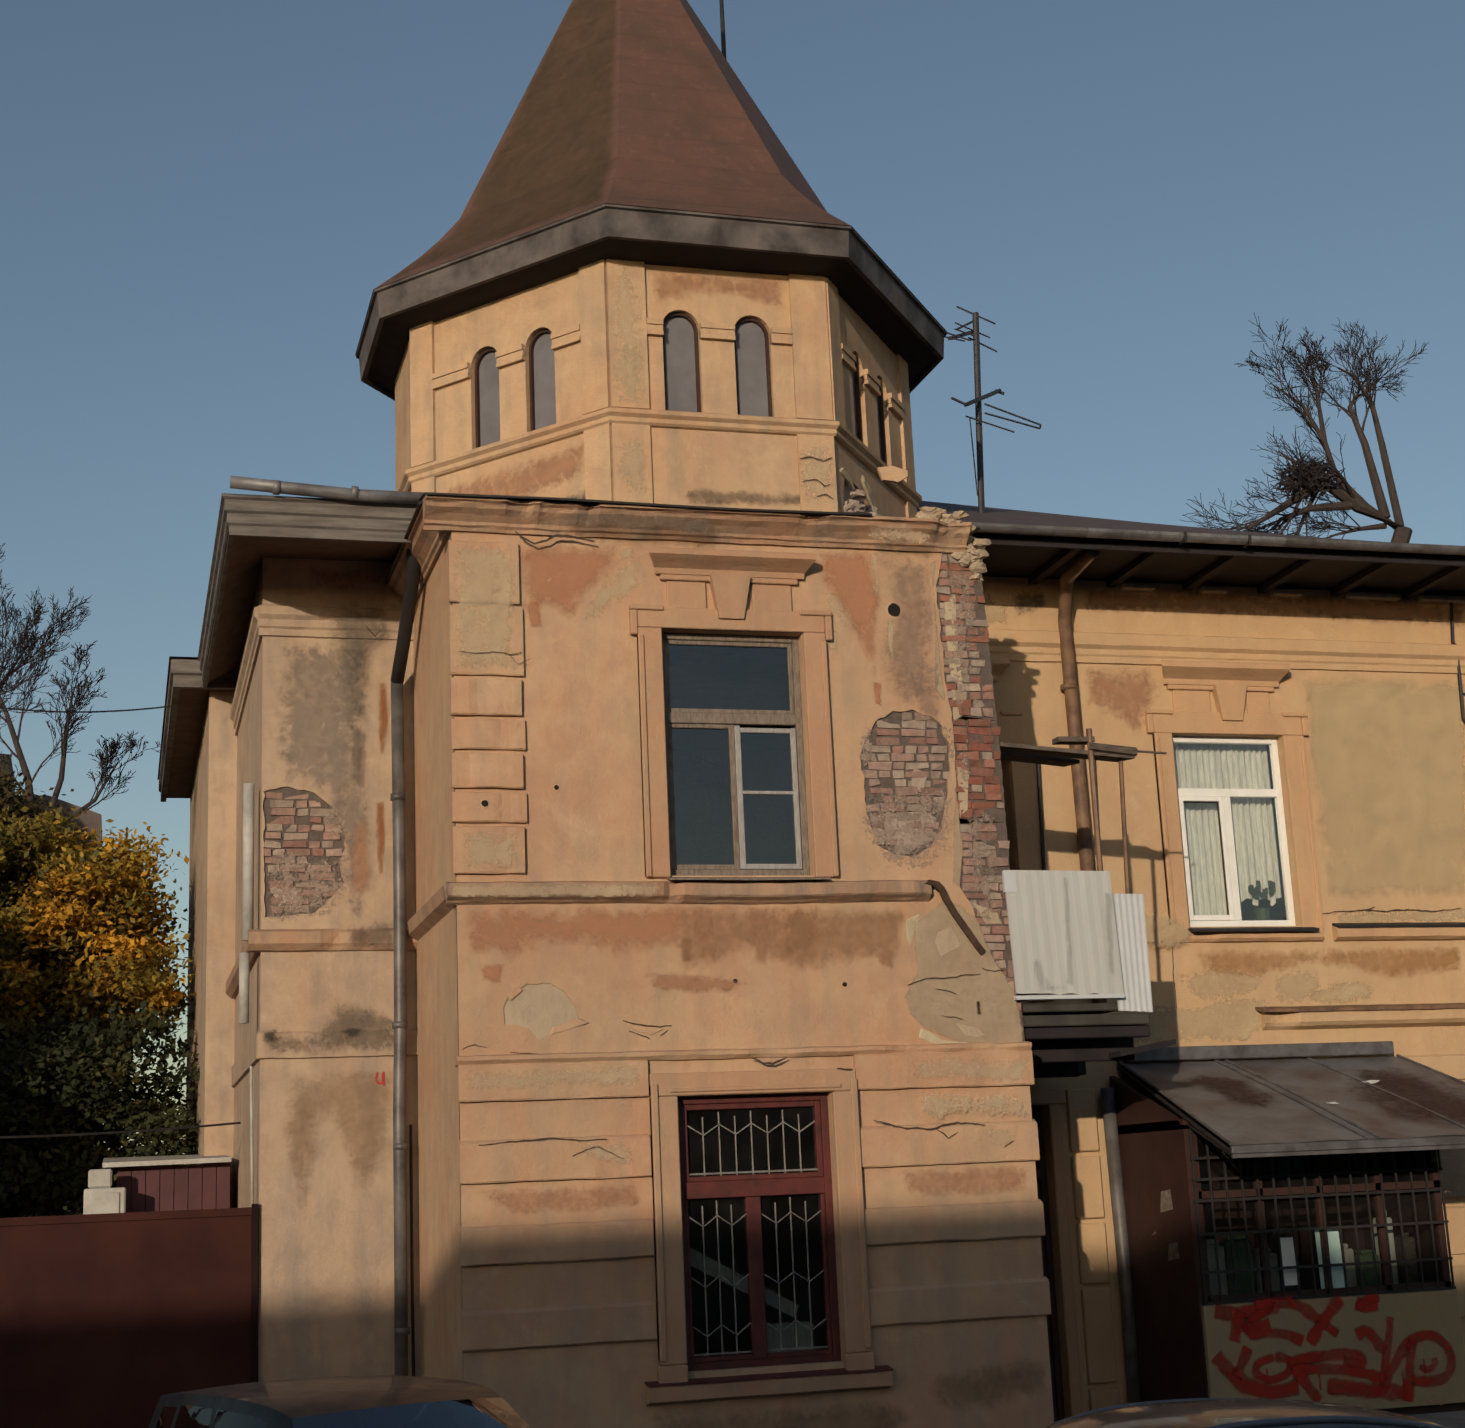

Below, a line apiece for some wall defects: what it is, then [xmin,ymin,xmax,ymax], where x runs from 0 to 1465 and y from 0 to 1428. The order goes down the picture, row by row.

flaking render [800,447,1025,1044]
flaking render [263,787,345,917]
flaking render [503,983,589,1040]
crack [479,1137,624,1159]
crack [874,1120,1014,1147]